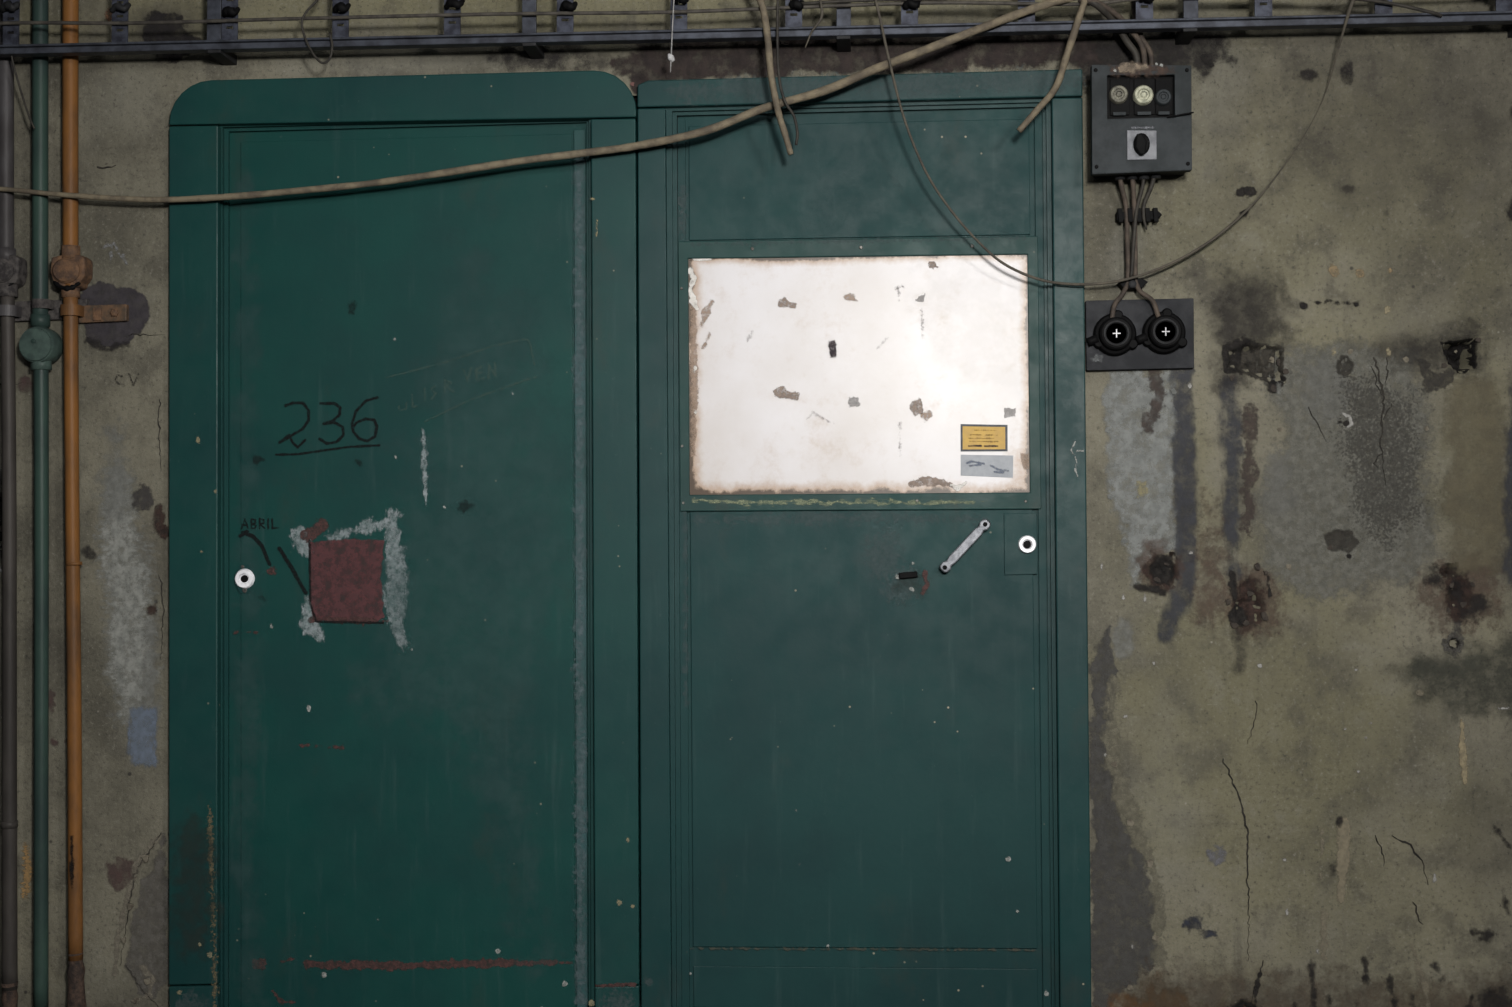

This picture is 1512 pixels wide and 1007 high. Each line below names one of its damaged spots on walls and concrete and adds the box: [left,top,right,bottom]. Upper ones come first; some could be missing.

damp [1158,368,1197,642]
damp [1220,377,1259,548]
crack [1222,700,1264,1003]